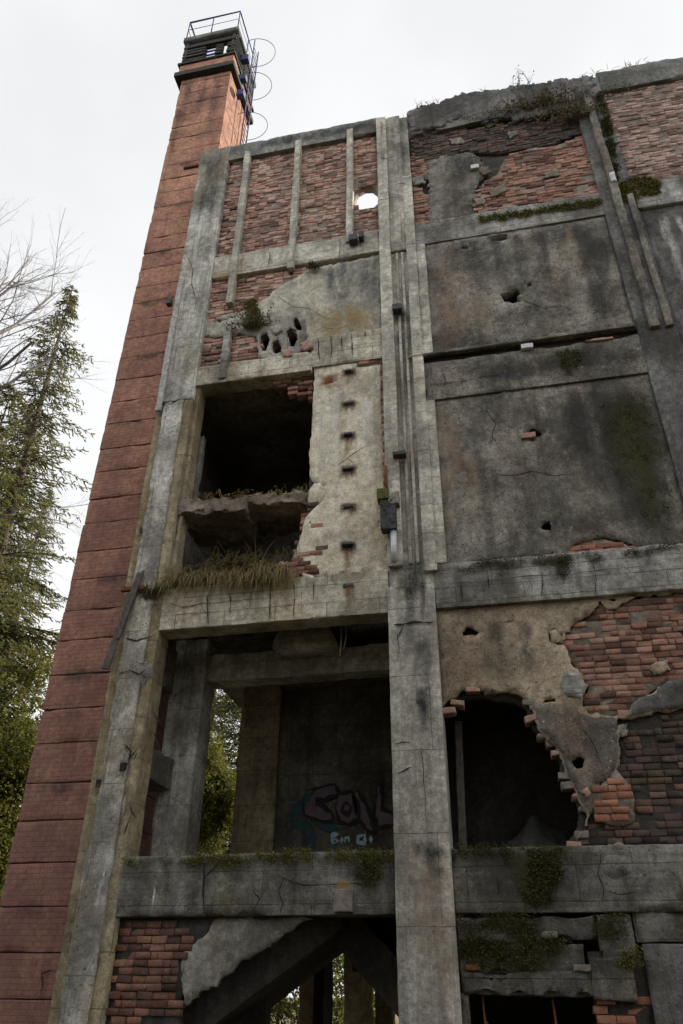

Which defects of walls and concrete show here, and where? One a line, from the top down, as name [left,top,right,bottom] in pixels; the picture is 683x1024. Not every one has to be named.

spalling [409,112,598,224]
spalling [207,266,309,323]
spalling [201,317,313,367]
crack [496,471,581,483]
spalling [275,550,319,579]
spalling [443,687,496,718]
spalling [522,699,559,760]
spalling [549,593,683,846]
crack [202,859,220,917]
crack [253,874,373,916]